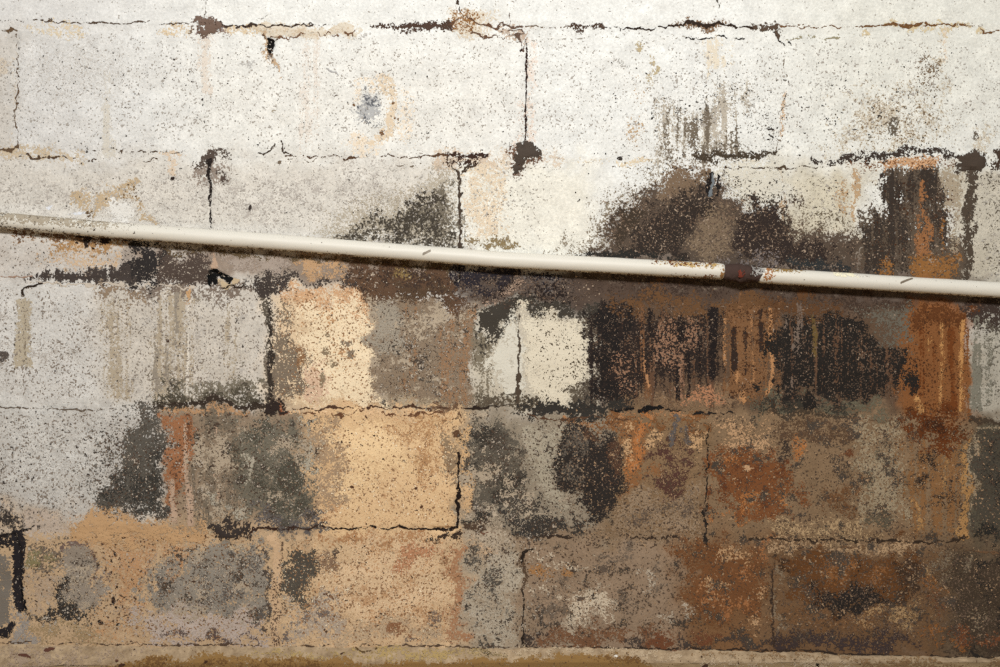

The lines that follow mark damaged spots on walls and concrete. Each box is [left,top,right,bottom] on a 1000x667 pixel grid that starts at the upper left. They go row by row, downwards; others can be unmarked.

crack [258,91,479,283]
water stain [300,150,521,251]
crack [447,0,999,201]
corrosion [832,153,963,279]
corrosion [65,401,249,616]
water stain [0,229,445,648]
corrosion [159,245,532,514]
crack [248,452,499,536]
crack [2,534,1000,659]
crack [293,313,735,545]
water stain [373,262,1000,658]
corrosion [663,293,1000,653]